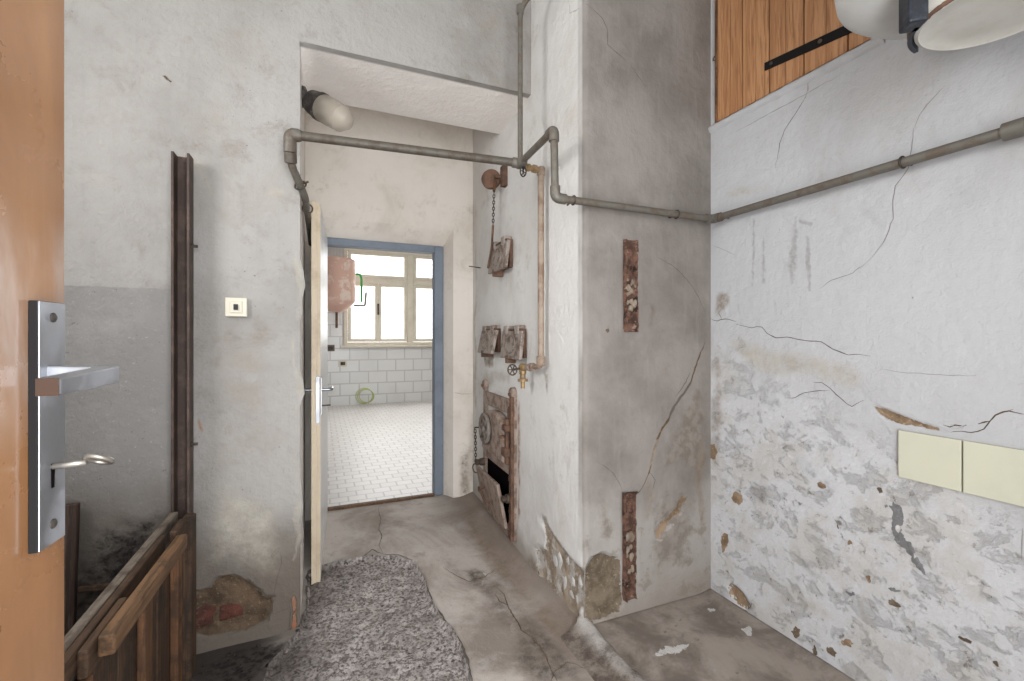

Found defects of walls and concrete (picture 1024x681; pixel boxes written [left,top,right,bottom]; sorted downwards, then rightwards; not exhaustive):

crack [741,75,839,162]
crack [824,90,941,286]
crack [601,257,976,493]
spalling [873,404,966,432]
crack [944,409,1021,433]
water stain [76,504,171,622]
spalling [196,573,275,637]
crack [426,567,586,680]
spalling [535,470,624,622]
peeling [639,478,706,590]
spalling [844,575,903,611]
peeling [876,487,929,578]